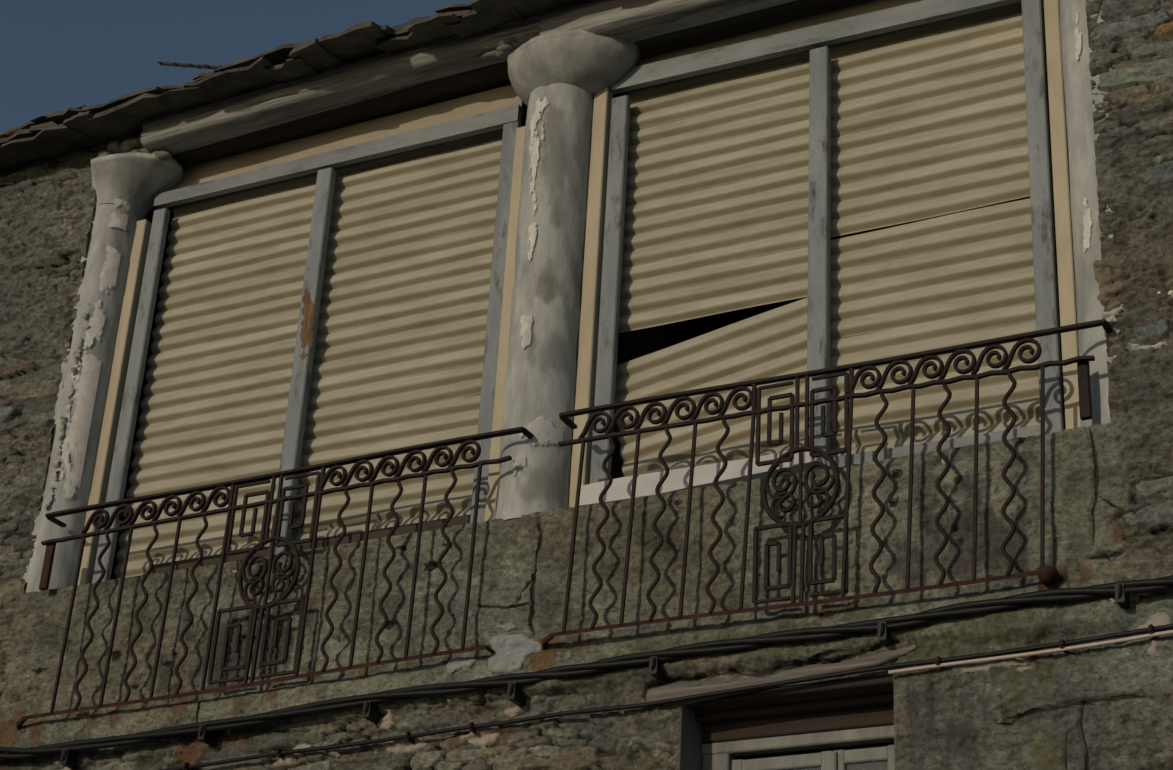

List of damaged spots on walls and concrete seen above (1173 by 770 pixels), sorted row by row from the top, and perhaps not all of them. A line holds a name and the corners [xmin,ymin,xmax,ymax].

peeling [1074,11,1082,60]
peeling [108,198,130,231]
peeling [527,96,549,261]
peeling [520,315,533,349]
peeling [44,244,121,509]
crack [1088,425,1173,563]
crack [476,517,543,635]
spalling [446,622,542,675]
crack [997,694,1146,770]